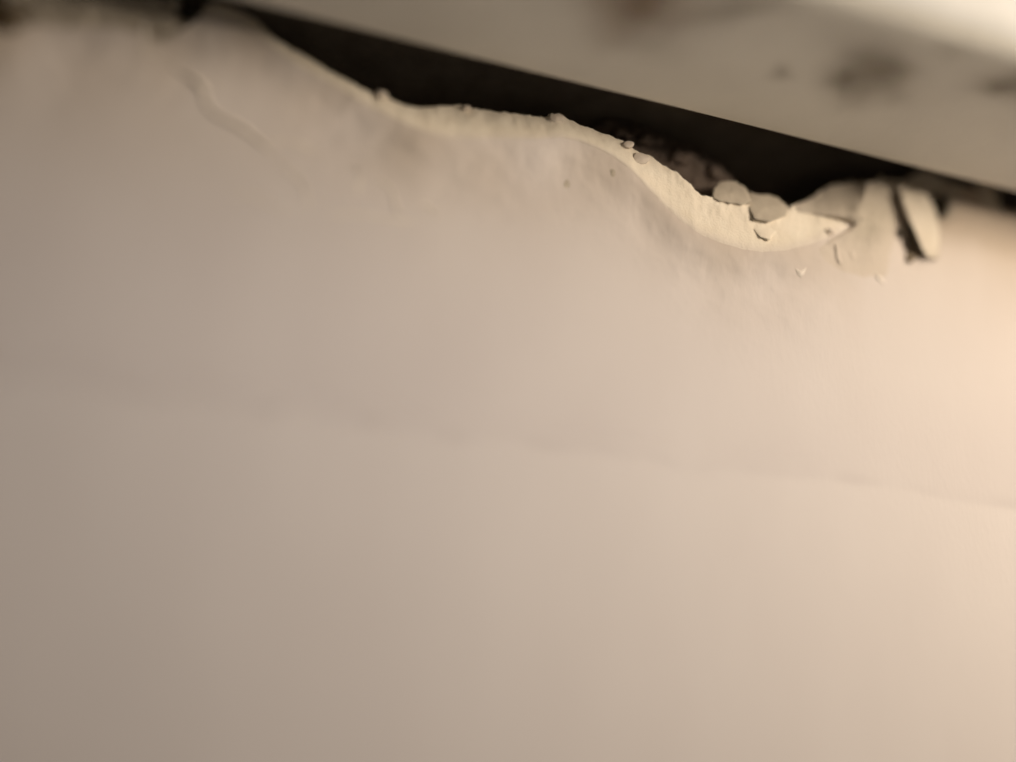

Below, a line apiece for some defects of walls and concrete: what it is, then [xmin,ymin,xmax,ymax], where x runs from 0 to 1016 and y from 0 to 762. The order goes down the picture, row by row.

flaking render [1,0,862,252]
peeling [895,169,1000,263]